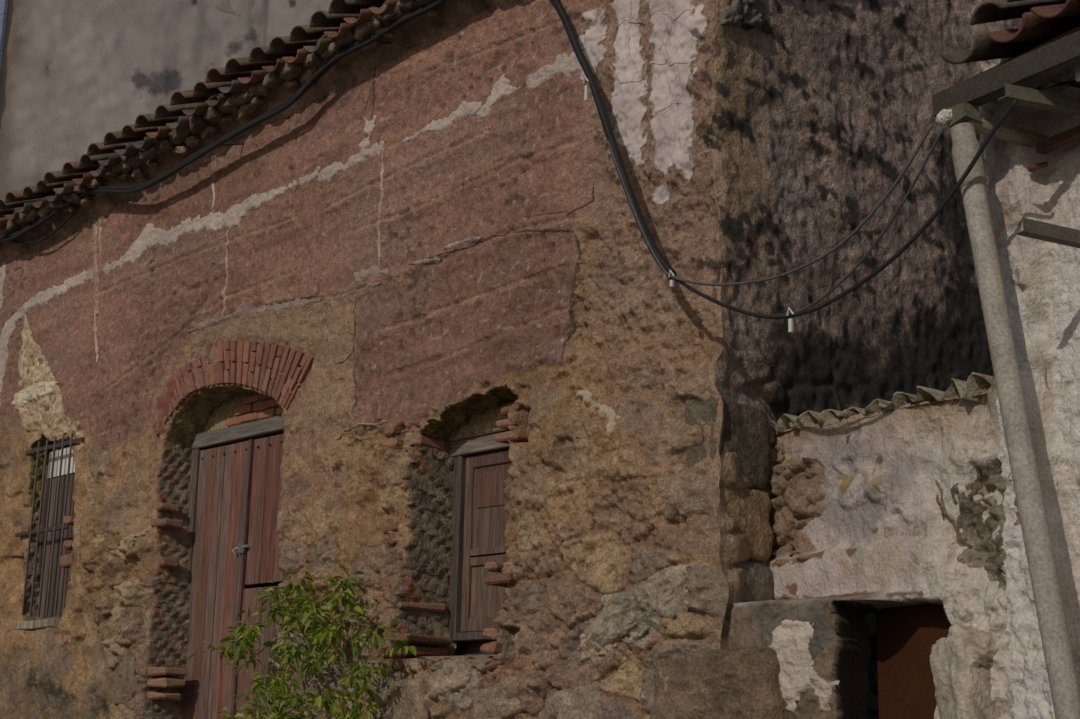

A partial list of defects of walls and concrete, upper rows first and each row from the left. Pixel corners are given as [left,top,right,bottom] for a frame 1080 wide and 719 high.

flaking render [402,0,767,205]
damp [702,109,761,151]
damp [818,0,862,20]
damp [895,3,927,72]
flaking render [0,115,388,452]
crack [187,152,387,442]
crack [408,183,595,361]
damp [691,203,791,279]
damp [746,65,994,419]
flaking render [577,389,621,441]
spalling [951,456,1021,591]